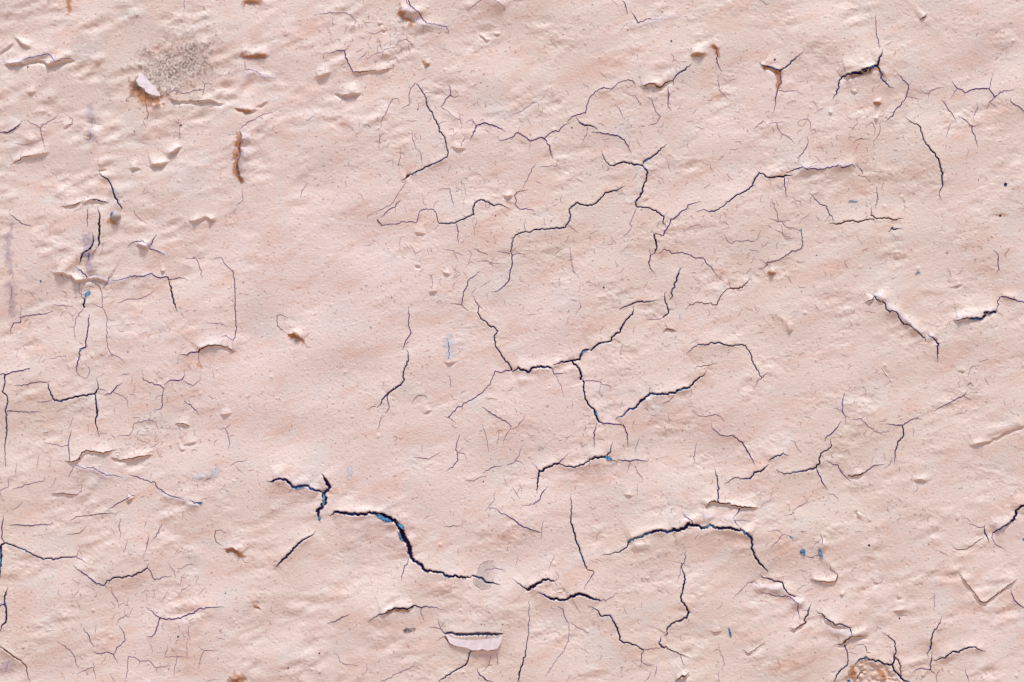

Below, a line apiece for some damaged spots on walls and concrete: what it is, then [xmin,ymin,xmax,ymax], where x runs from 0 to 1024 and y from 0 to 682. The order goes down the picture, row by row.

crack [0,23,85,67]
crack [235,36,281,85]
crack [0,104,61,149]
peeling [124,72,258,170]
crack [233,112,279,212]
crack [269,0,1024,682]
crack [0,170,247,682]
spalling [435,621,503,651]